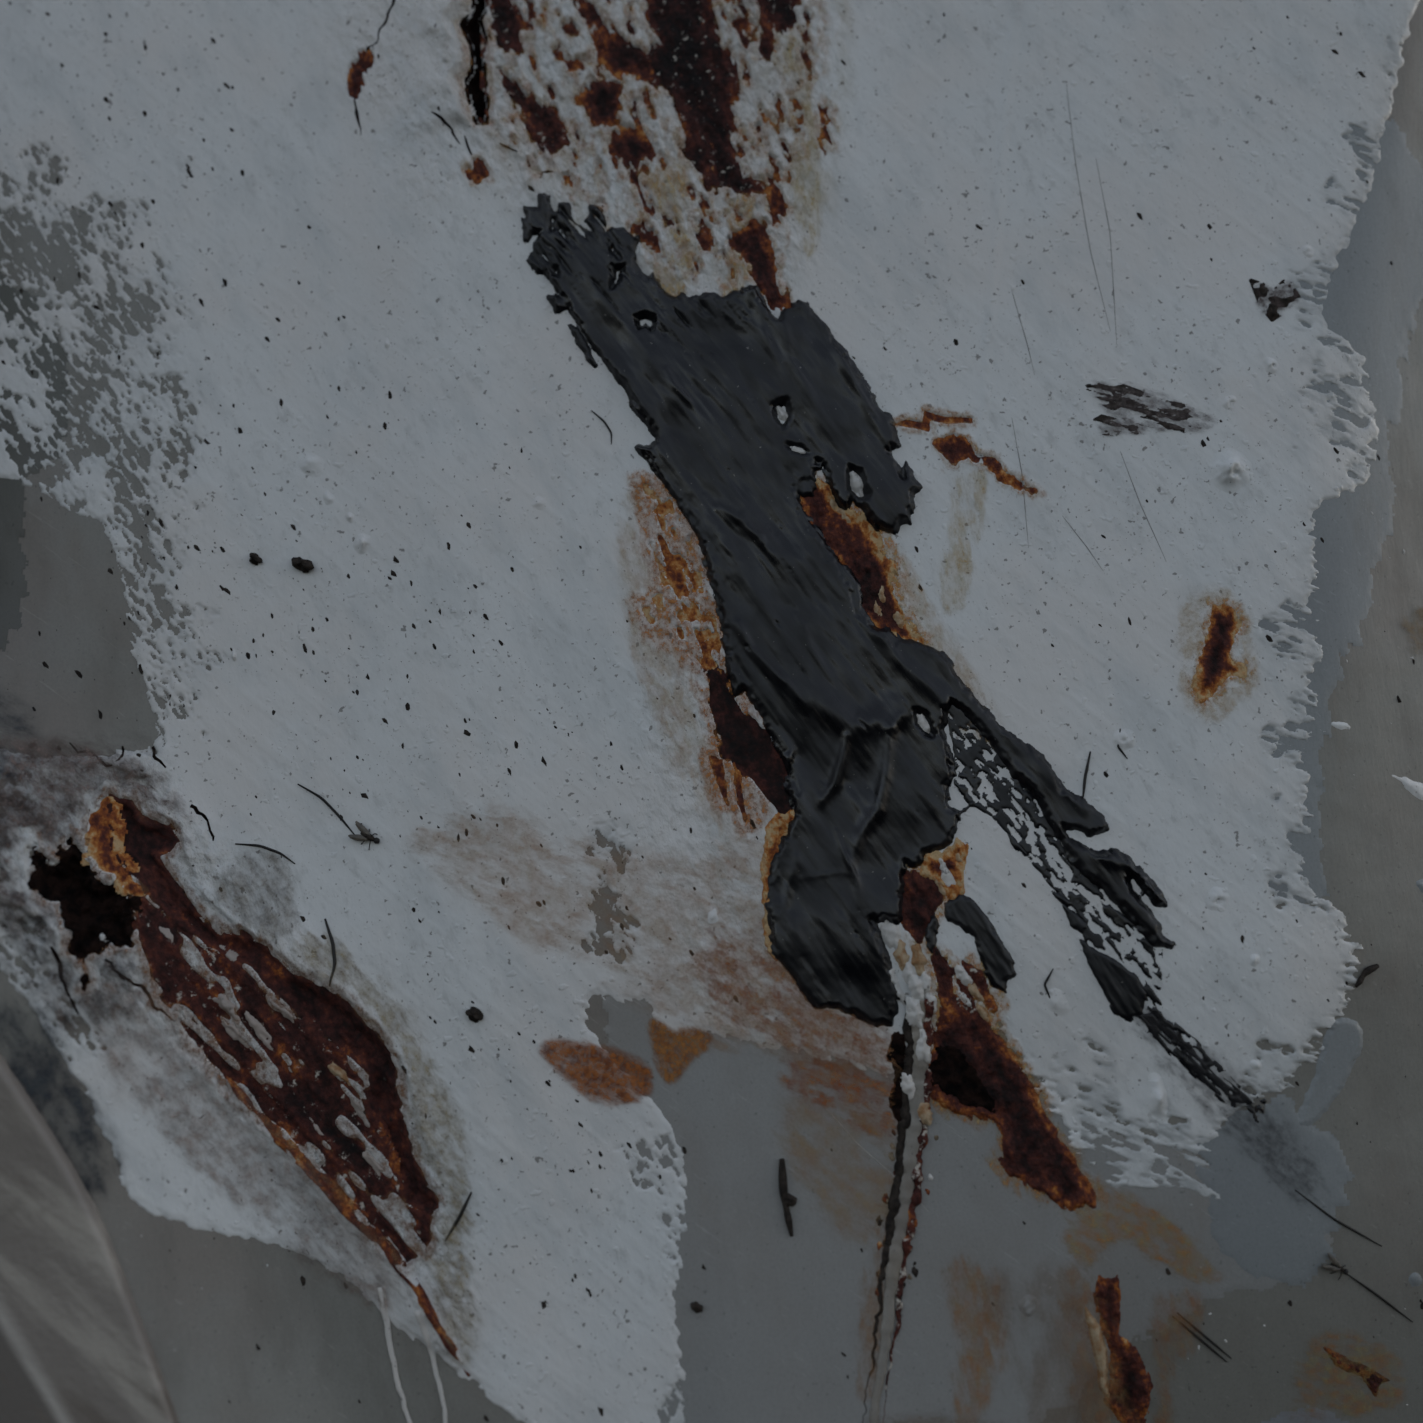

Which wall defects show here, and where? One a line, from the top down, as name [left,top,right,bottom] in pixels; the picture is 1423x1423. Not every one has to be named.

corrosion [347,0,395,135]
corrosion [431,0,835,311]
spalling [1249,279,1301,322]
corrosion [800,478,933,645]
corrosion [1188,597,1254,706]
corrosion [629,472,897,1135]
corrosion [106,793,439,1215]
corrosion [540,1020,711,1103]
peeling [900,972,933,1126]
corrosion [880,837,1103,1212]
corrosion [223,1075,471,1377]